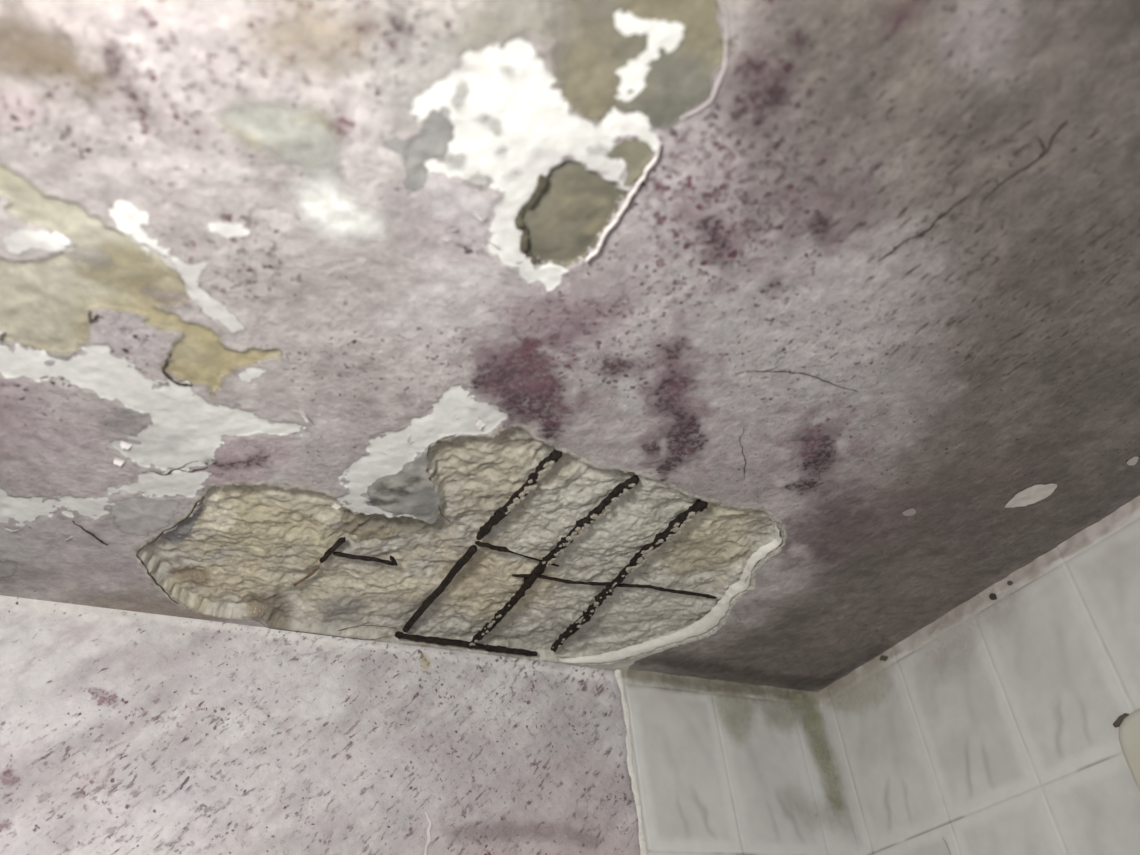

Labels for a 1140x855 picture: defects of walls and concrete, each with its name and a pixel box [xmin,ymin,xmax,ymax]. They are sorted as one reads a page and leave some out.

peeling [382,0,731,291]
crack [878,119,1068,261]
spalling [0,165,788,671]
water stain [596,358,632,374]
water stain [785,479,823,495]
peeling [1005,484,1057,508]
water stain [792,696,842,808]